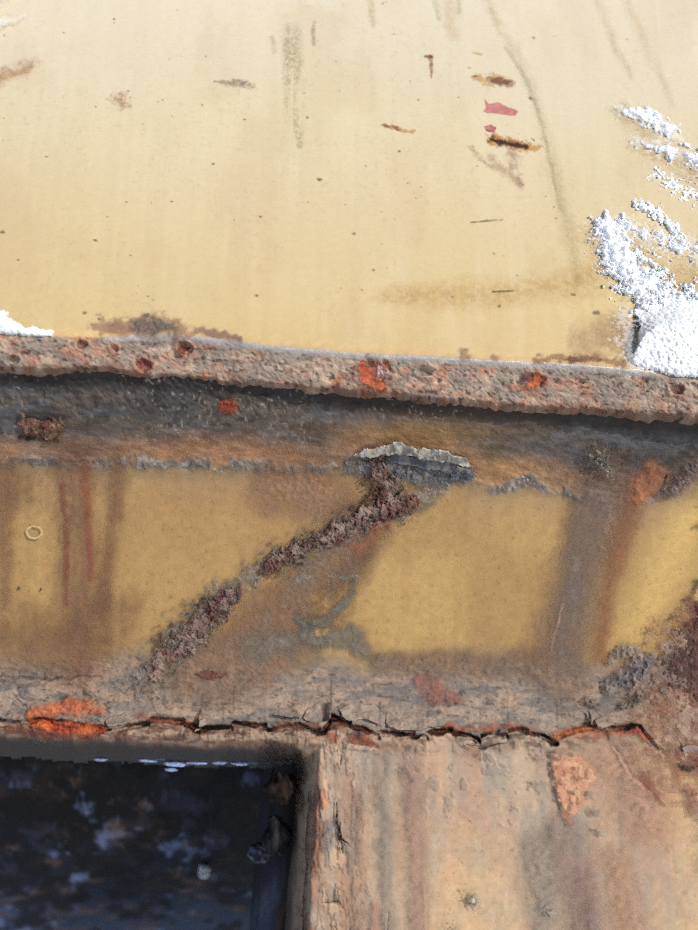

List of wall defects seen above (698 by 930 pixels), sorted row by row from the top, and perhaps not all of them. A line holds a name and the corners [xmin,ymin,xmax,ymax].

corrosion [473,75,513,87]
corrosion [487,134,540,150]
corrosion [91,313,242,341]
corrosion [534,335,626,368]
peeling [335,442,477,534]
corrosion [167,461,389,702]
crack [0,716,45,724]
corrosion [6,697,107,740]
corrosion [539,602,698,841]
crack [68,701,657,791]
crack [302,791,350,930]